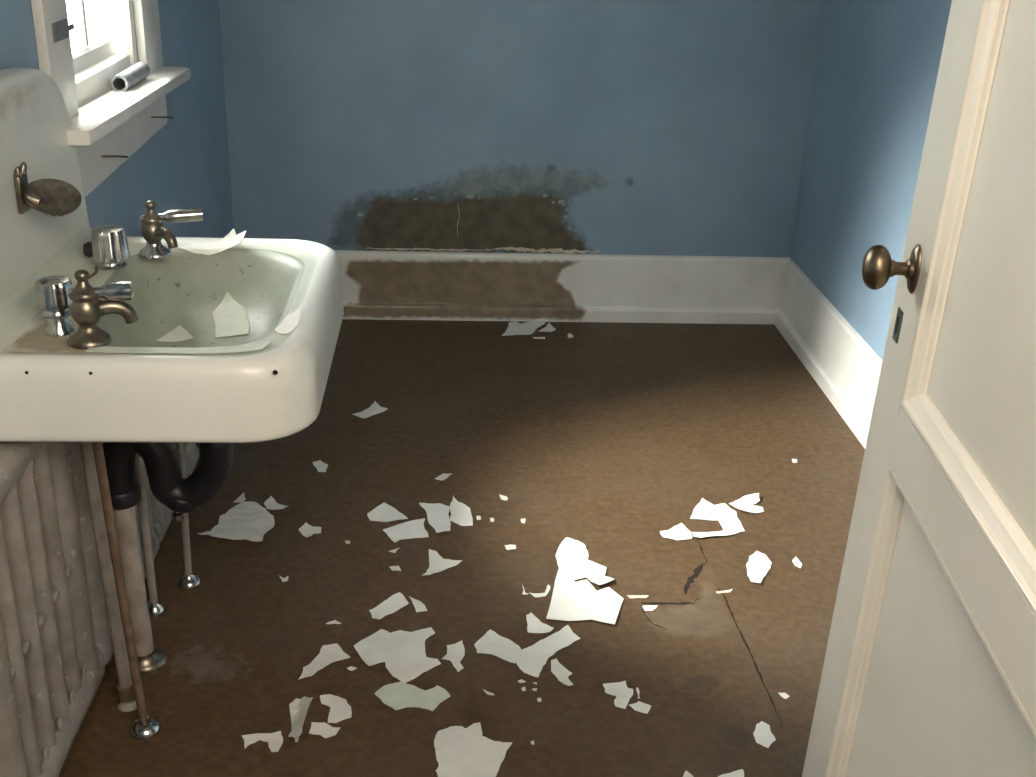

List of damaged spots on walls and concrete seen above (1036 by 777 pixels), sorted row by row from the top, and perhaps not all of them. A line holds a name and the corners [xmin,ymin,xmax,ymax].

peeling [312,150,635,339]
crack [628,540,783,726]